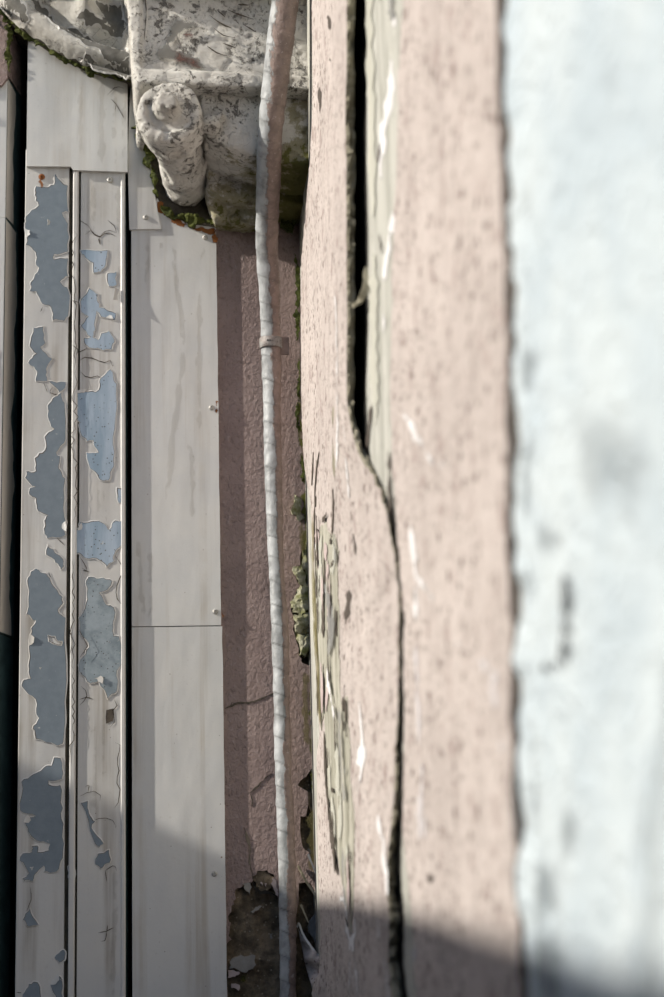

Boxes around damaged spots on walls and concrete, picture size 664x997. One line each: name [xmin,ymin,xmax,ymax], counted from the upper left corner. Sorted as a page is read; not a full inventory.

peeling [0,0,131,80]
peeling [18,174,121,882]
crack [311,0,408,997]
flaking render [290,492,355,934]
peeling [22,908,40,928]
peeling [22,949,67,997]
spalling [226,871,280,997]
spalling [296,883,315,997]